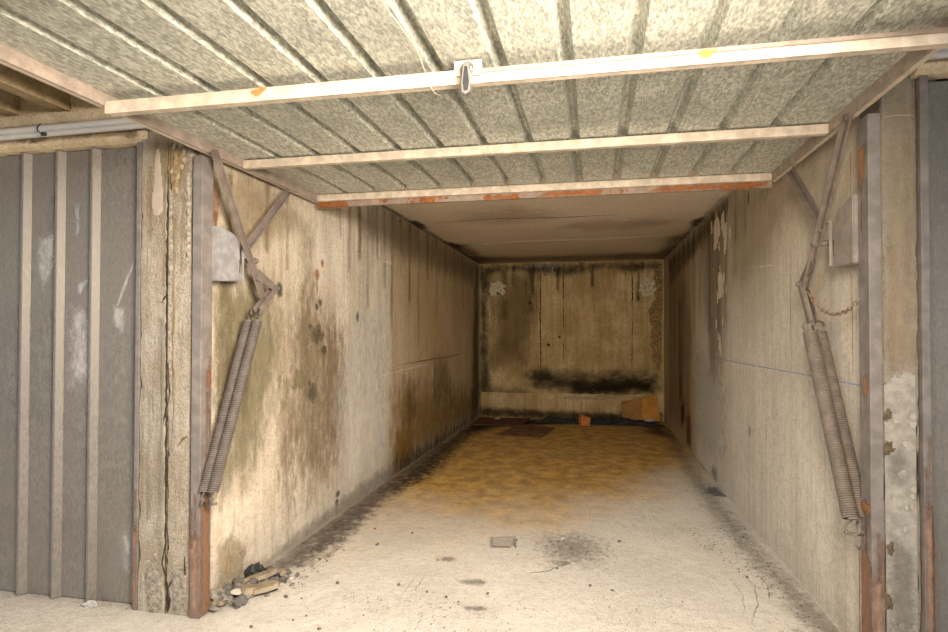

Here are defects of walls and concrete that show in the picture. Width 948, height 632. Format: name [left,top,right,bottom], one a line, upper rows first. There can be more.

rust [655,181,767,192]
peeling [711,210,731,255]
peeling [717,266,727,304]
crack [147,138,189,614]
leakage [272,202,728,560]
rust [189,492,210,616]
rust [861,500,884,632]
rust [925,506,935,632]